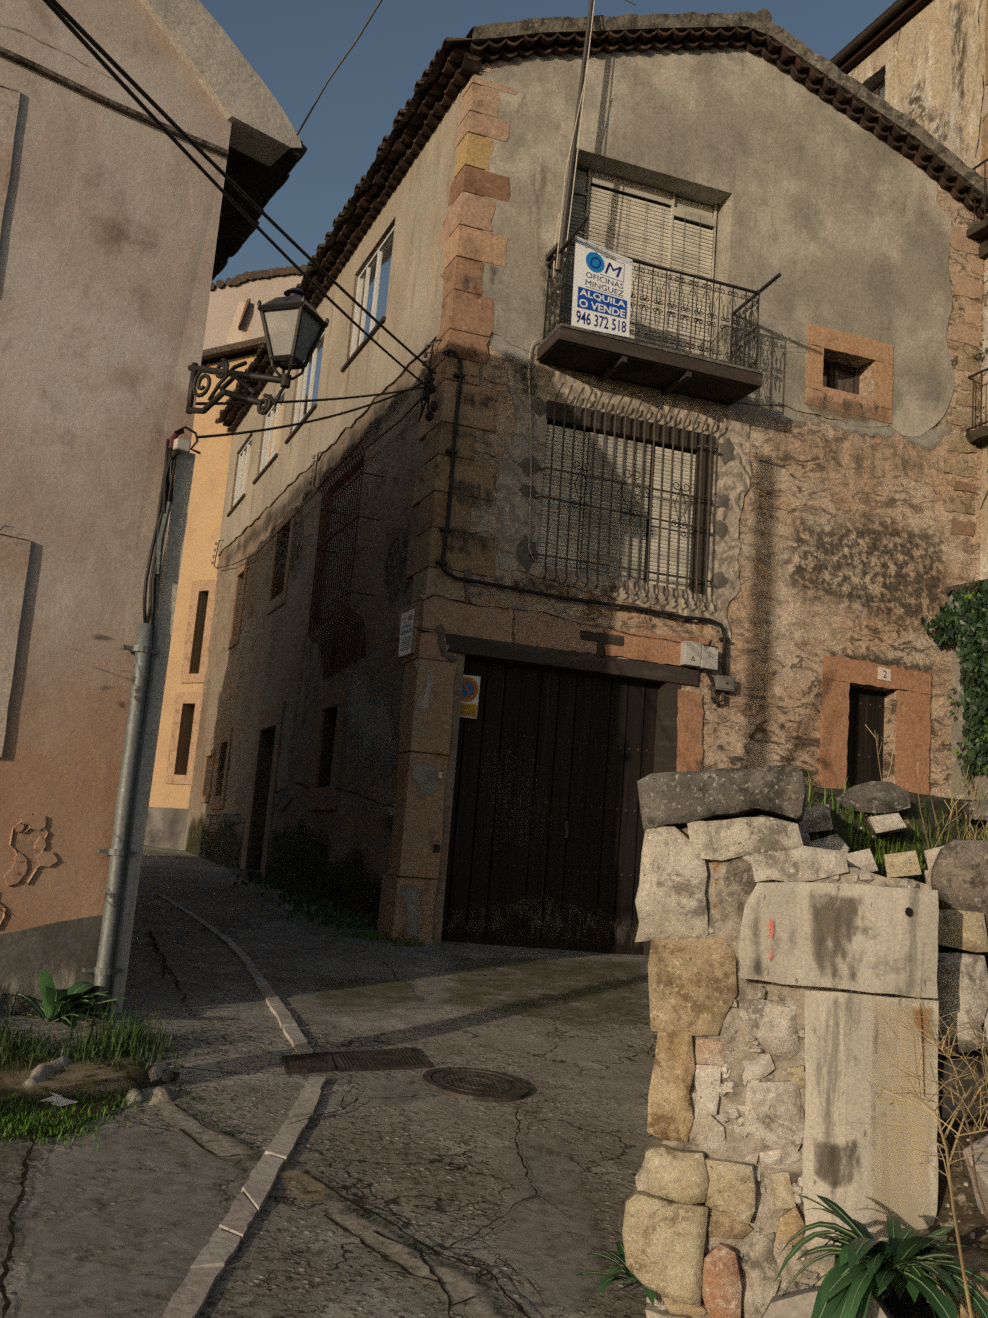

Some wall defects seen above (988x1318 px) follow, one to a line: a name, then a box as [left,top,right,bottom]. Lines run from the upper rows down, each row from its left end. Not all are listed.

water stain [908,85,951,141]
crack [174,1072,256,1156]
crack [292,1075,417,1123]
crack [0,1124,41,1318]
crack [302,1108,572,1318]